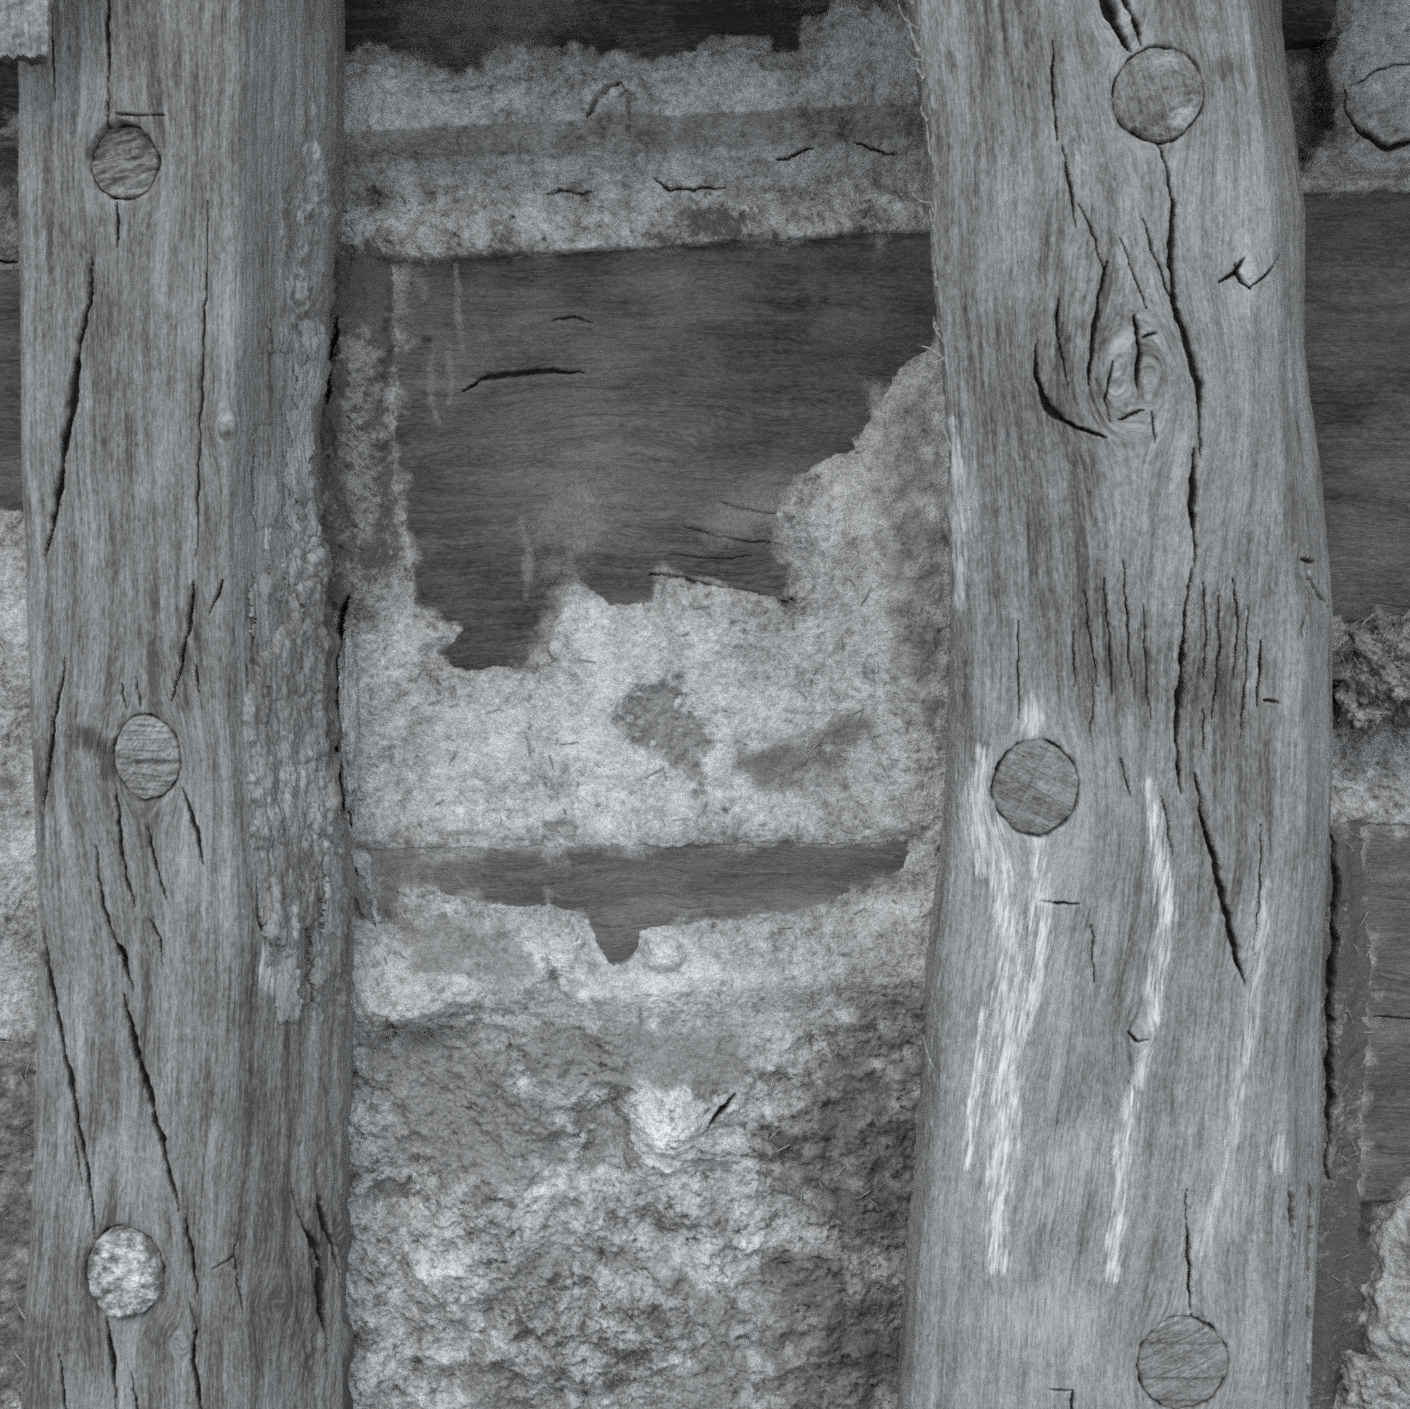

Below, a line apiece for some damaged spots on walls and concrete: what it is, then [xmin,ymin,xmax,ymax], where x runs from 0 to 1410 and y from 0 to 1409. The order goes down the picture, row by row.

crack [106,0,165,129]
crack [1099,0,1139,48]
crack [1343,63,1410,152]
crack [49,281,94,547]
crack [1033,44,1276,981]
crack [1014,622,1022,714]
crack [183,788,203,860]
crack [98,793,177,1192]
crack [50,966,95,1218]